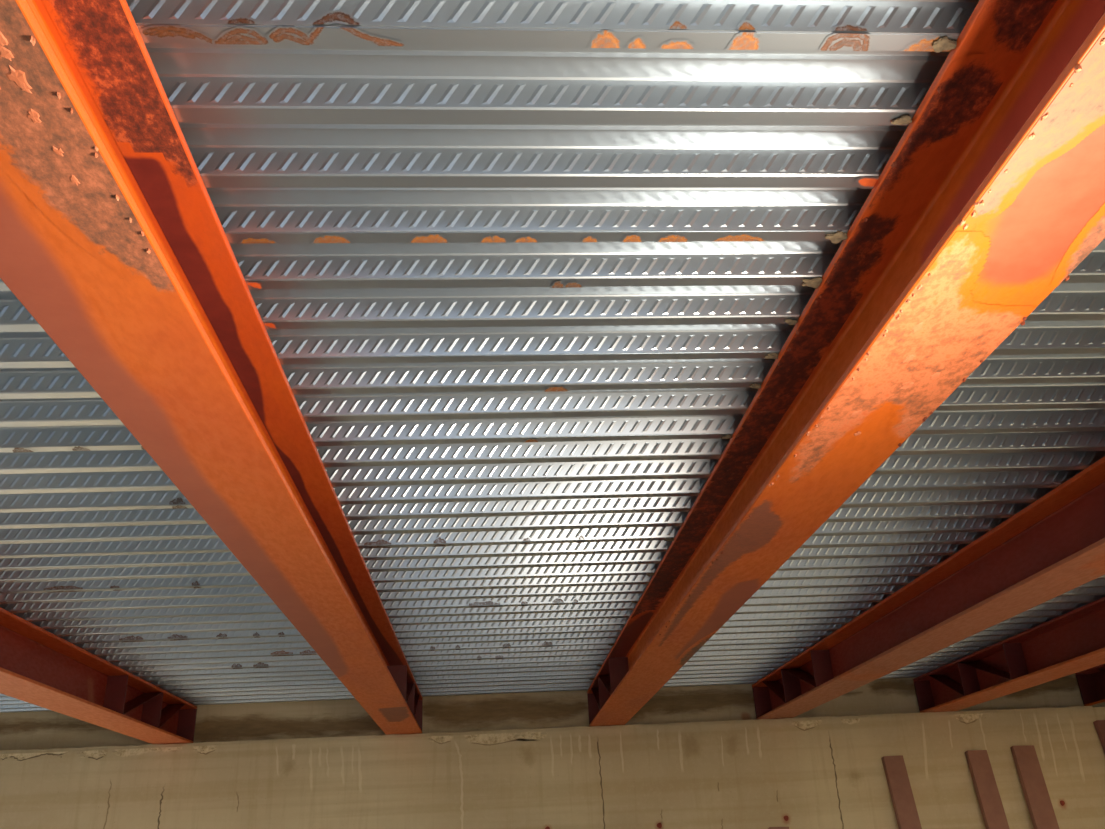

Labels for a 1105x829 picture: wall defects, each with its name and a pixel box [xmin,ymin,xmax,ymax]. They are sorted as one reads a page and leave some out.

corrosion [586,19,698,49]
corrosion [42,0,406,192]
corrosion [407,233,452,243]
corrosion [477,235,540,243]
corrosion [619,234,691,242]
corrosion [1050,203,1105,287]
corrosion [631,0,1057,618]
corrosion [675,629,719,668]
water stain [0,713,117,741]
crack [157,781,167,829]
crack [596,733,606,829]
crack [827,728,844,829]